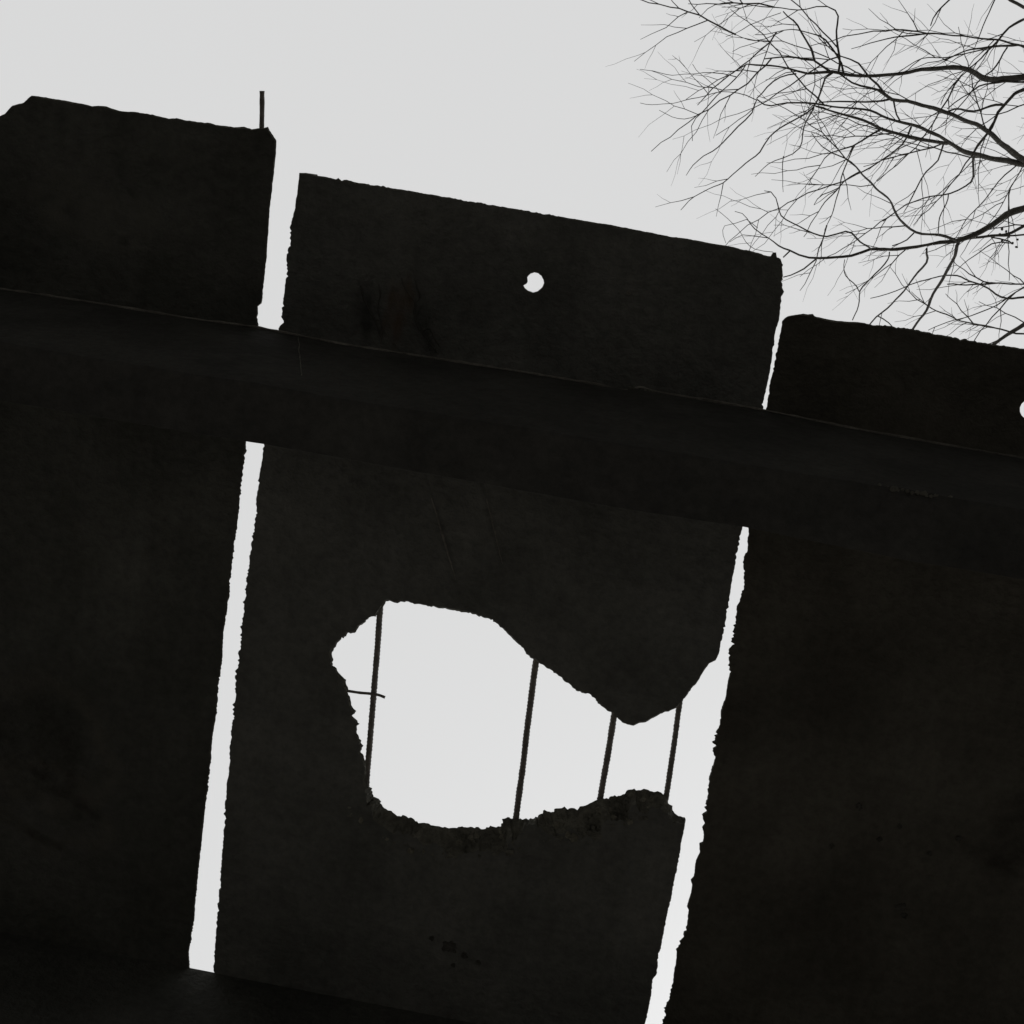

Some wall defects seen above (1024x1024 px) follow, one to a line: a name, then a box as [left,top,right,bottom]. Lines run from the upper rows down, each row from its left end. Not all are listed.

spalling [365,607,383,786]
spalling [382,659,539,859]
spalling [543,701,683,843]